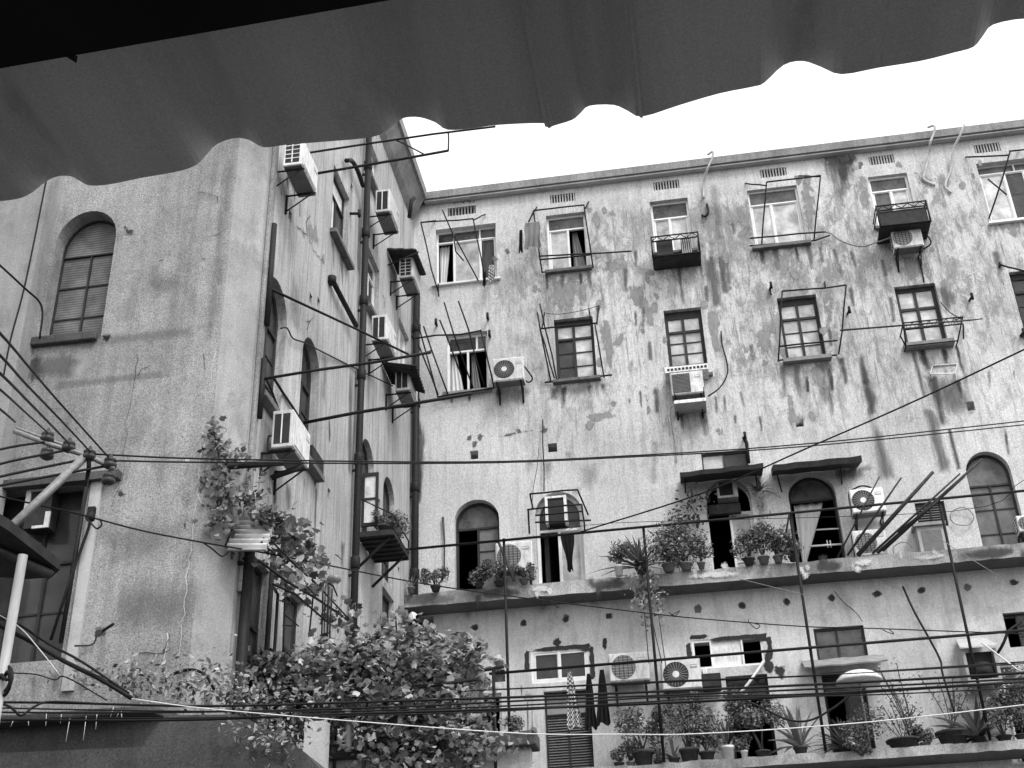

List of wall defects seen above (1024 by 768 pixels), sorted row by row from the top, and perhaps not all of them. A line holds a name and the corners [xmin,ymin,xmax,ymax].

water stain [826,160,852,188]
water stain [700,257,730,305]
water stain [795,246,841,273]
water stain [940,288,953,307]
water stain [861,358,875,413]
water stain [912,347,967,469]
water stain [876,430,891,476]
crack [132,432,206,662]